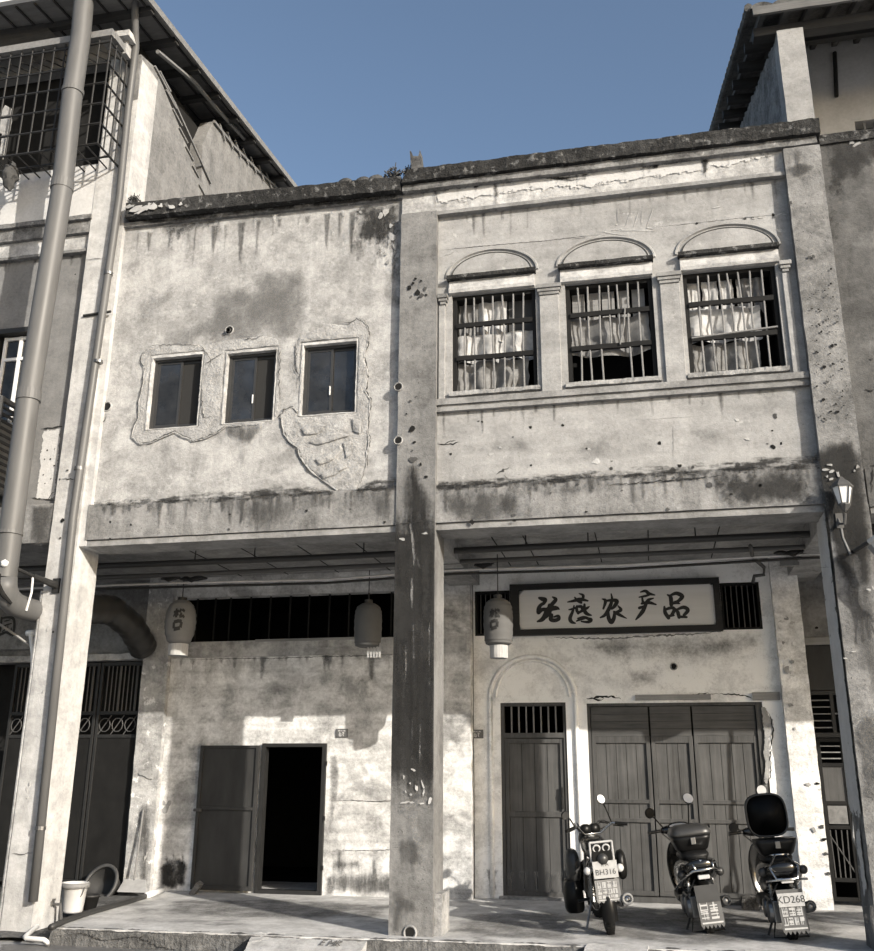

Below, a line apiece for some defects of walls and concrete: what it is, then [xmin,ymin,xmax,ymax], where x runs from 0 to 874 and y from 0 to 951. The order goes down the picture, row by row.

damp [827,141,874,194]
damp [142,213,217,249]
damp [233,205,294,257]
damp [314,194,397,252]
crack [131,344,241,444]
crack [278,318,372,491]
damp [97,487,332,523]
damp [356,477,395,512]
damp [436,442,874,671]
damp [391,471,435,794]
damp [161,859,187,888]
damp [333,857,389,891]